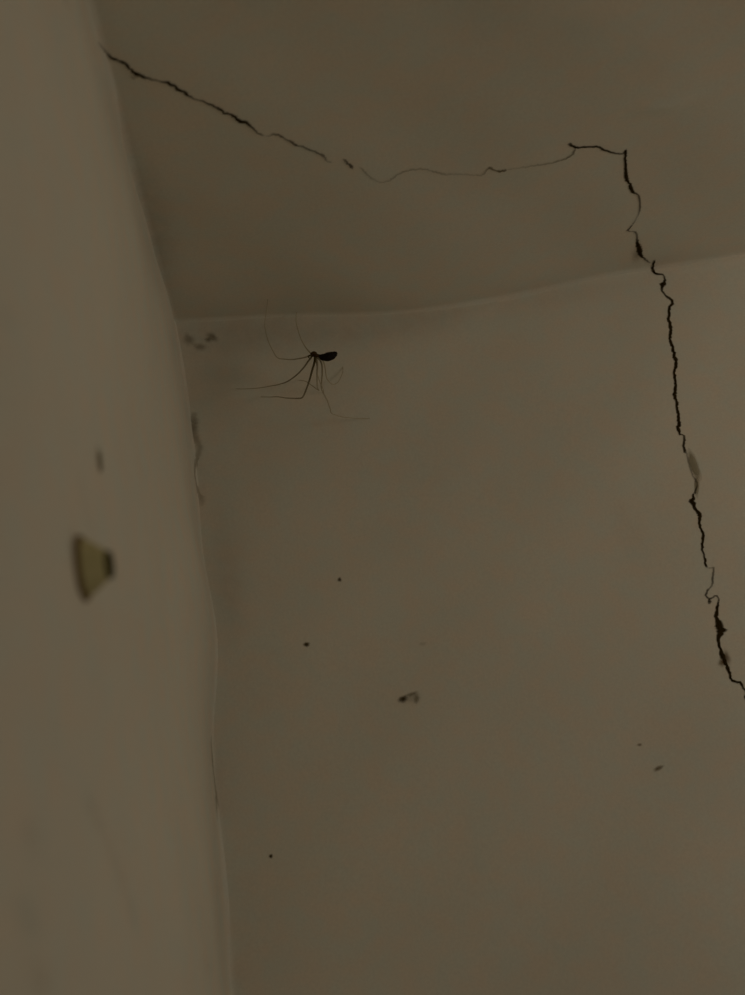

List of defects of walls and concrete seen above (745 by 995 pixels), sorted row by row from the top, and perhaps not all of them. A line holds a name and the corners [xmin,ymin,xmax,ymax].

crack [107,54,322,155]
crack [567,143,686,453]
crack [689,487,745,697]